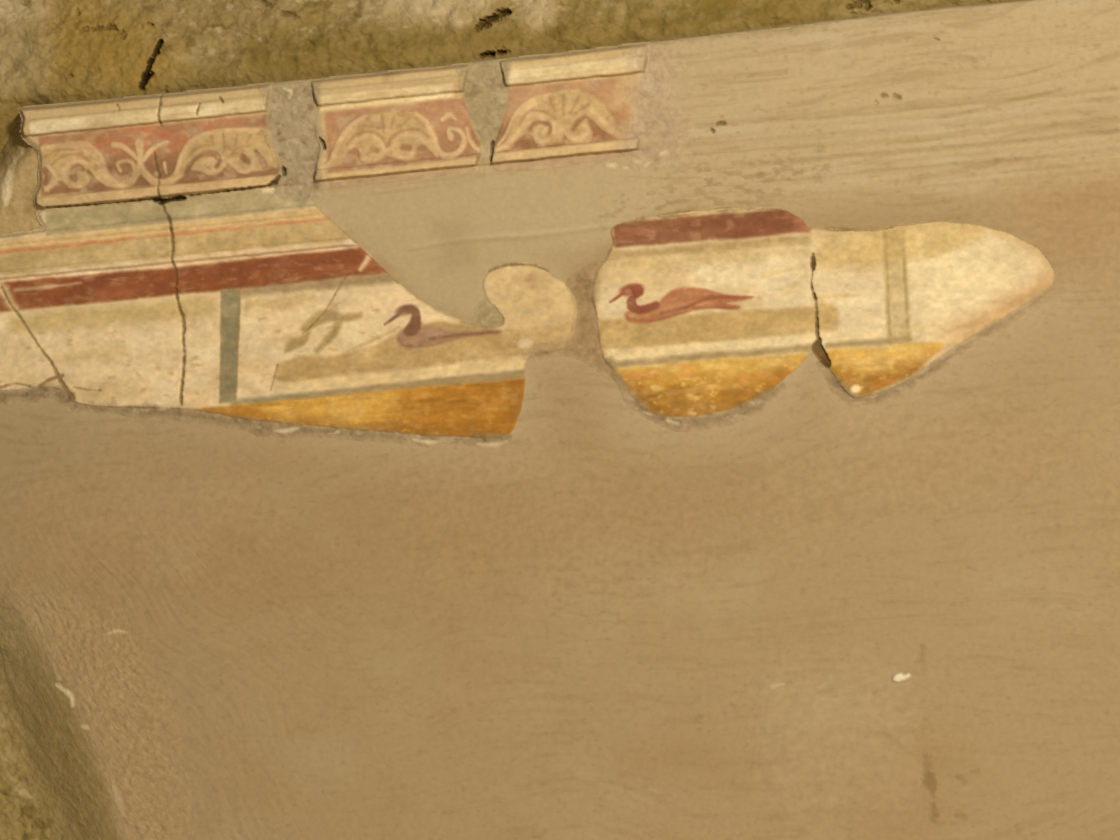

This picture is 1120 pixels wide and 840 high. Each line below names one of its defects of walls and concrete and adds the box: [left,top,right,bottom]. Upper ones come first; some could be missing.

spalling [259,166,287,195]
crack [0,285,102,402]
crack [45,85,272,406]
crack [269,363,279,391]
crack [301,277,347,335]
crack [809,225,894,369]